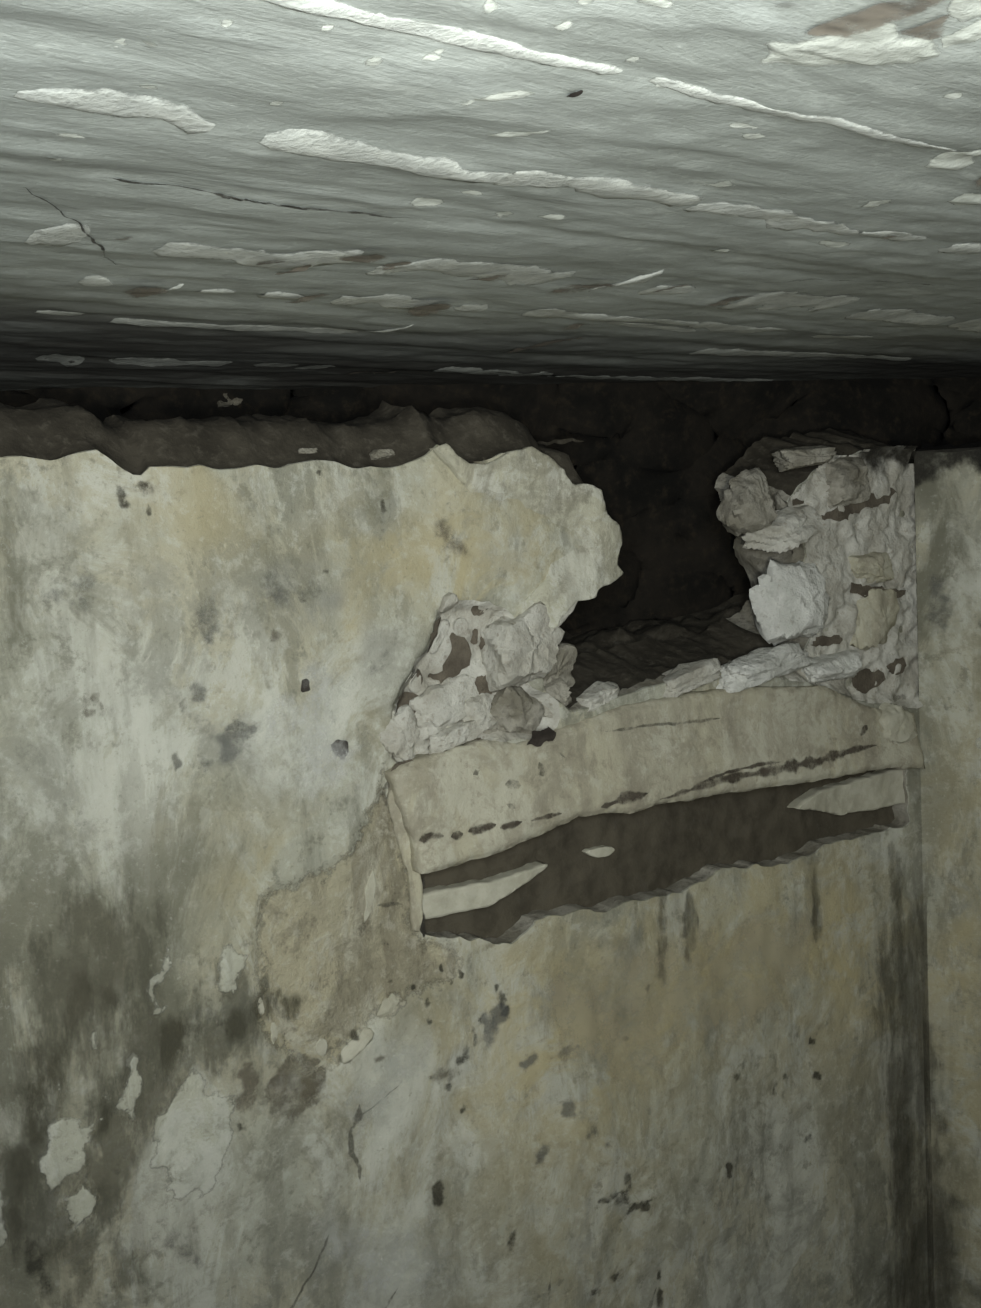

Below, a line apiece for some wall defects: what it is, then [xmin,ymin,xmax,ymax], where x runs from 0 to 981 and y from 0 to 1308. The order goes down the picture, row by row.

peeling [761,0,981,67]
spalling [394,444,624,718]
flaking render [779,447,923,709]
peeling [104,1052,143,1121]
damp [161,1021,184,1064]
damp [261,992,300,1019]
damp [237,1056,325,1113]
damp [481,1004,507,1037]
damp [881,911,933,1212]
peeling [151,1068,237,1200]
peeling [39,1118,103,1225]
damp [598,1174,651,1213]